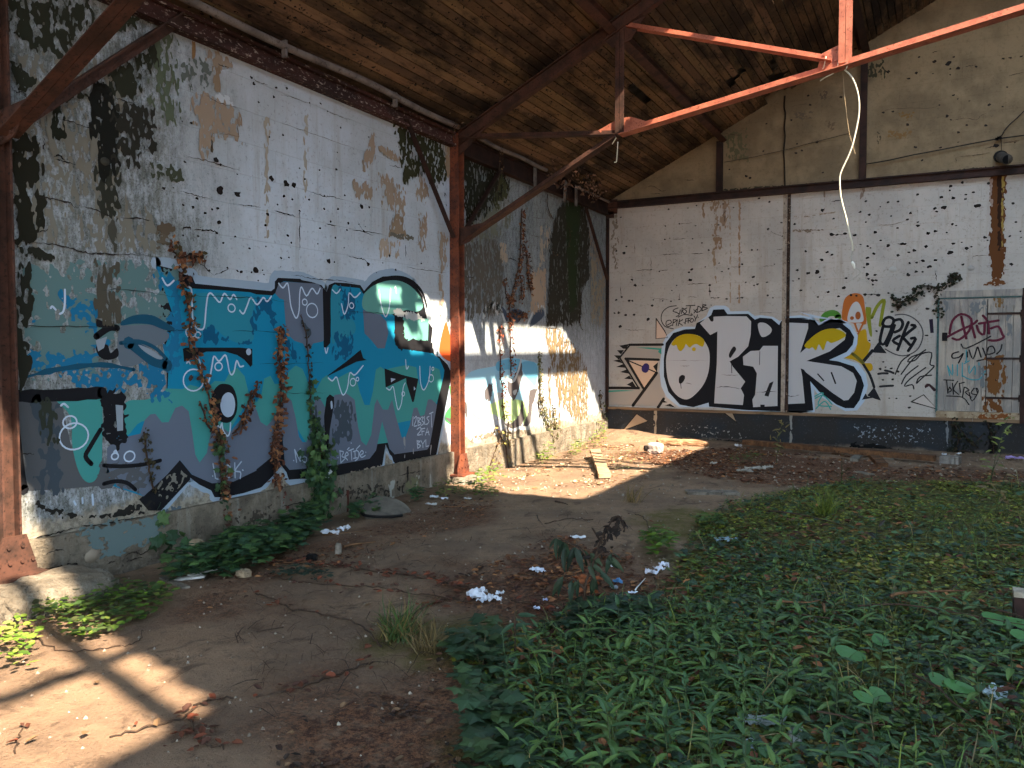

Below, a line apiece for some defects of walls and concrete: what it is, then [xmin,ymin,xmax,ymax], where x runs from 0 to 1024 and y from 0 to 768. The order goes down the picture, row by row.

water stain [14,75,157,256]
water stain [147,34,212,126]
peeling [182,49,243,166]
peeling [344,133,449,308]
rust [983,175,1007,308]
rust [978,354,1011,454]